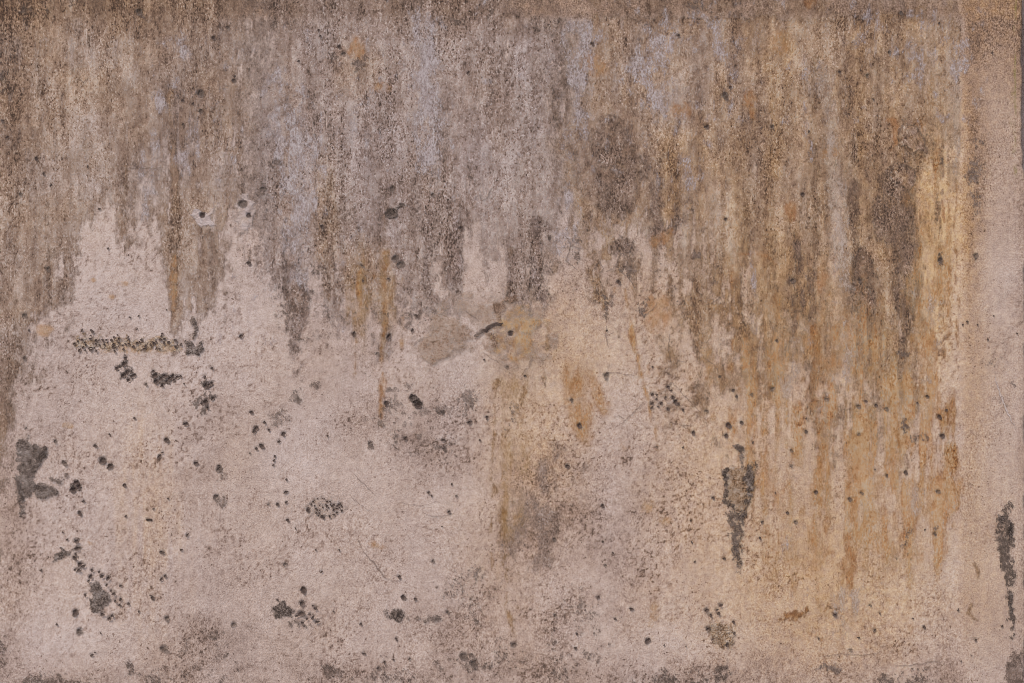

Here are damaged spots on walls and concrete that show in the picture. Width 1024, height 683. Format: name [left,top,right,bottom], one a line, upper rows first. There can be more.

leakage [0,0,968,491]
rust [564,370,604,440]
rust [628,324,651,413]
rust [728,224,961,589]